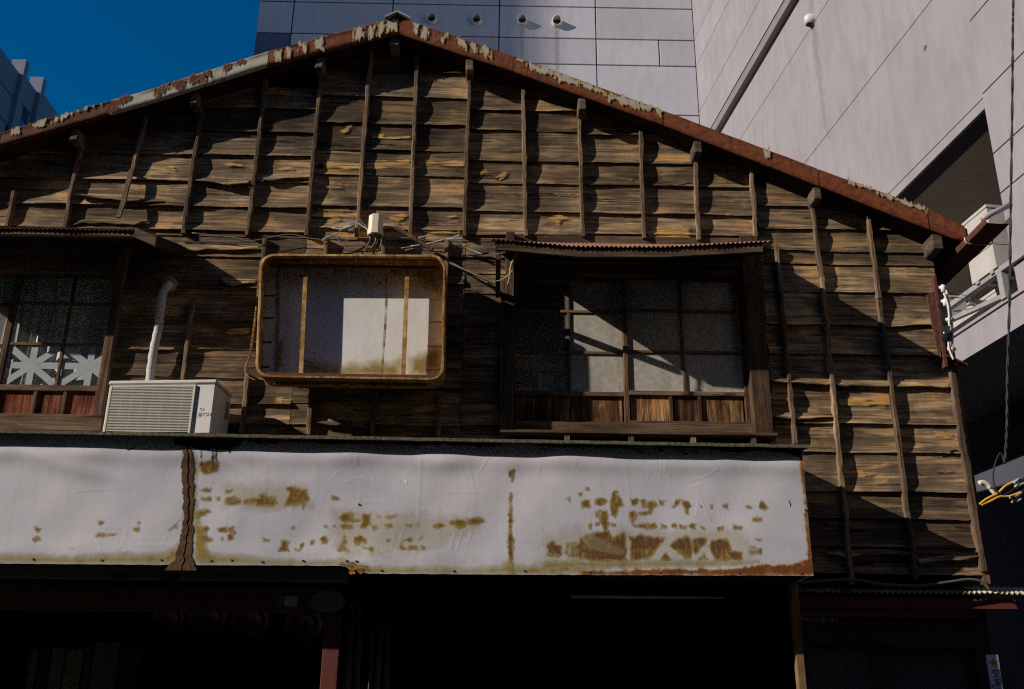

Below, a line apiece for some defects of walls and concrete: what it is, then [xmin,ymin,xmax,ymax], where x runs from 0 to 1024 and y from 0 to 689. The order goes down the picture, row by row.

peeling [274,35,324,62]
peeling [352,18,398,42]
peeling [412,21,492,59]
rust [153,59,245,98]
peeling [513,55,662,118]
peeling [11,103,102,135]
rust [109,94,131,114]
rust [304,273,398,374]
rust [412,349,441,375]
rust [183,455,219,474]
rust [193,459,813,575]